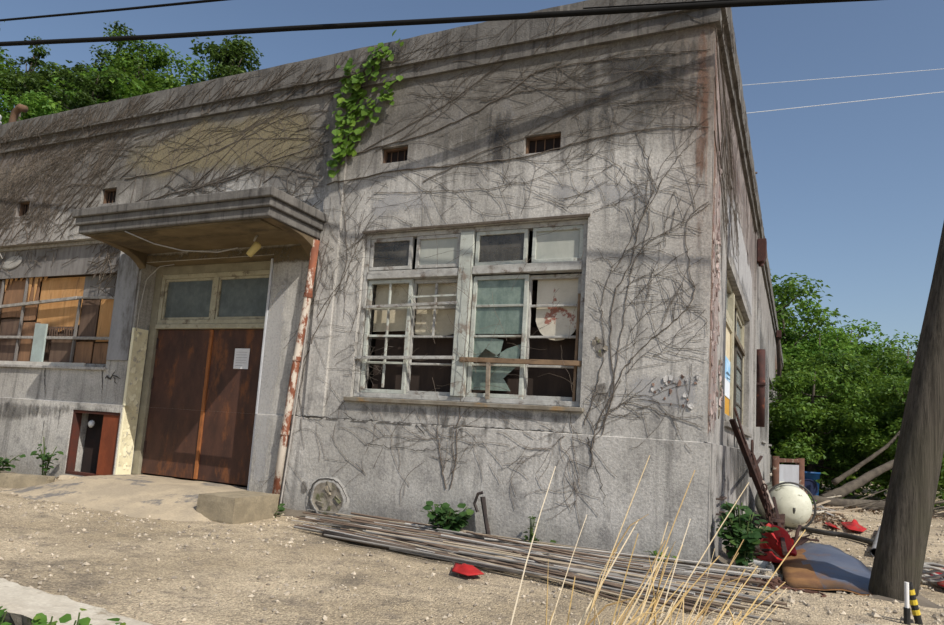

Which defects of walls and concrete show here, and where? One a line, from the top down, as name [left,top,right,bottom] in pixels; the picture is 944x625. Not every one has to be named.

peeling [708,68,723,431]
leakage [757,310,769,435]
crack [292,412,606,507]